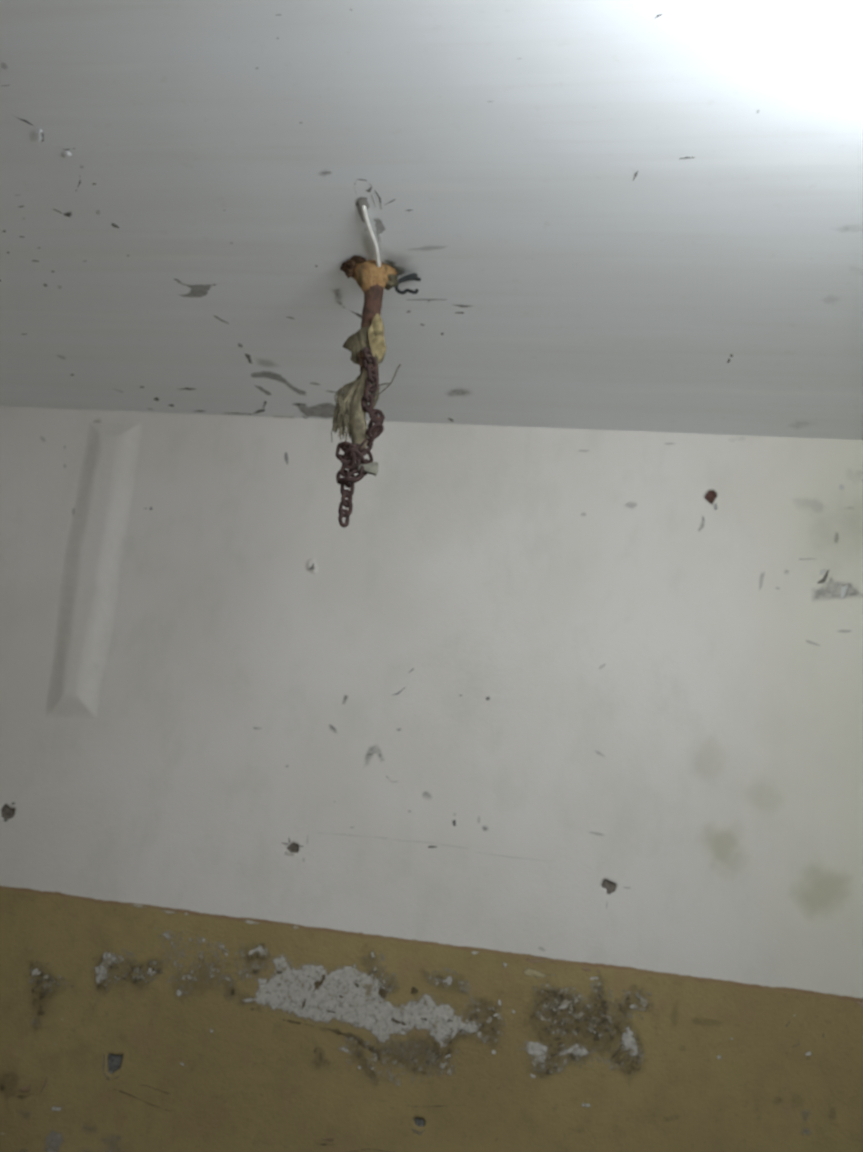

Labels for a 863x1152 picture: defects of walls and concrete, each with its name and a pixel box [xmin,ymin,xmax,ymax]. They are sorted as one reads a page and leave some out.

spalling [94,932,515,1085]
spalling [523,959,651,1078]